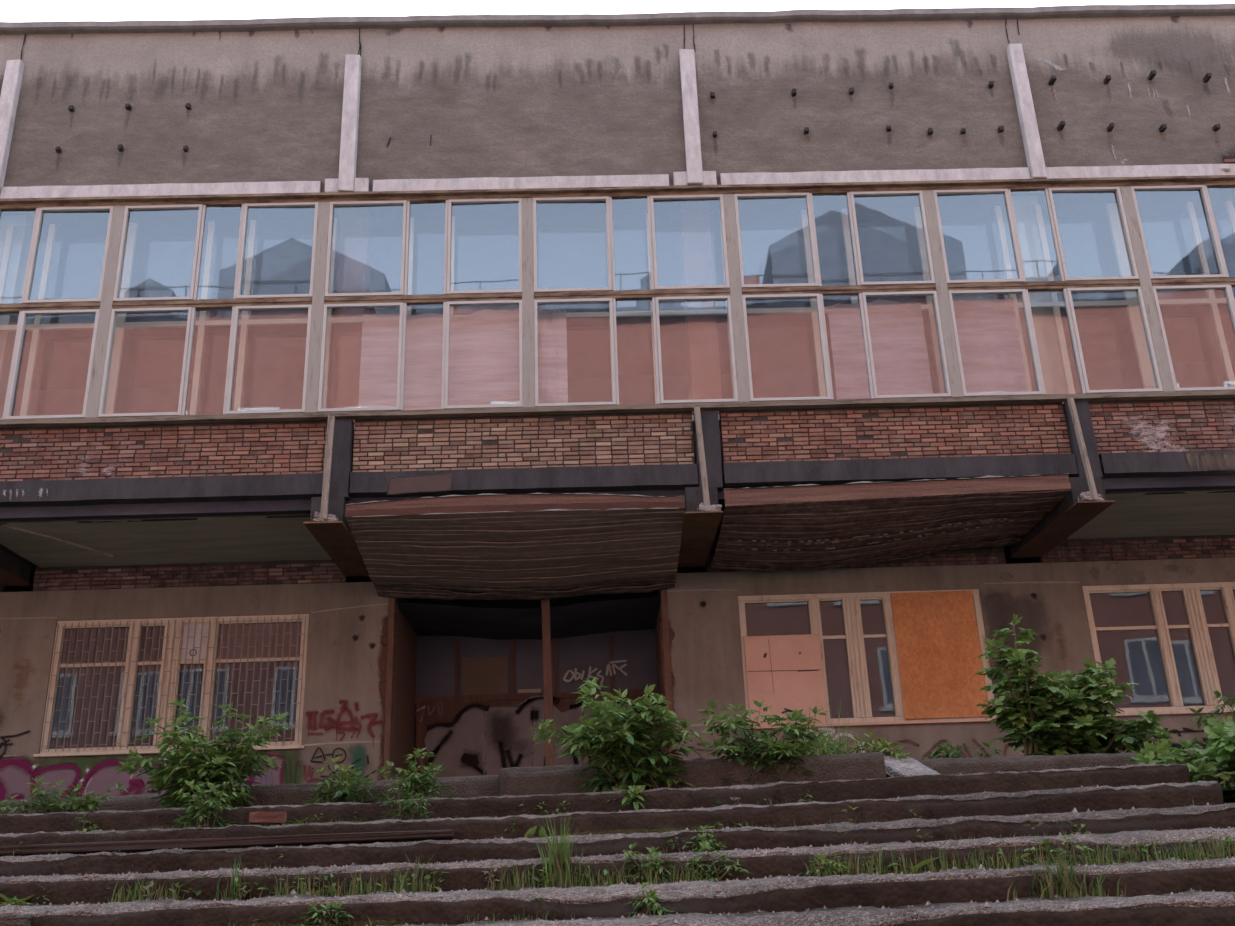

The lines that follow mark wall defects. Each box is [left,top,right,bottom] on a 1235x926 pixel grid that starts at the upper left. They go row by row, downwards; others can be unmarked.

water stain [1124,416,1235,470]